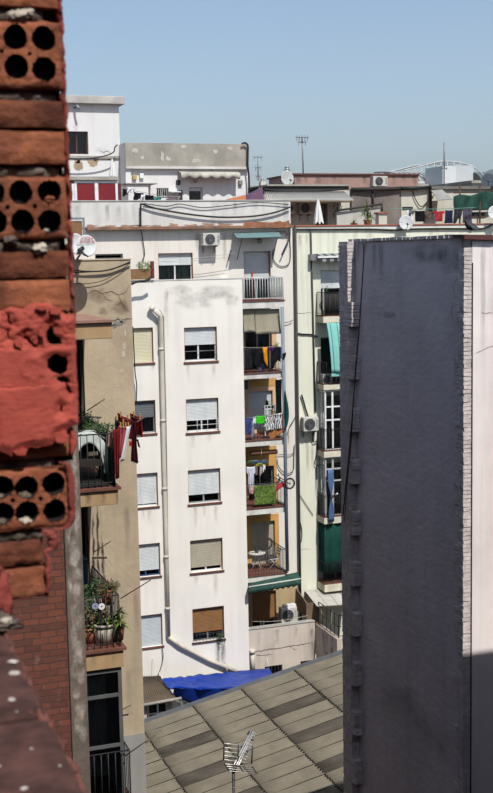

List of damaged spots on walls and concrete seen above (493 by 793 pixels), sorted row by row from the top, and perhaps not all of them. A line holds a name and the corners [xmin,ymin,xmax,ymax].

flaking render [0,0,111,595]
crack [88,286,132,321]
peeling [73,621,84,683]
peeling [73,694,84,735]